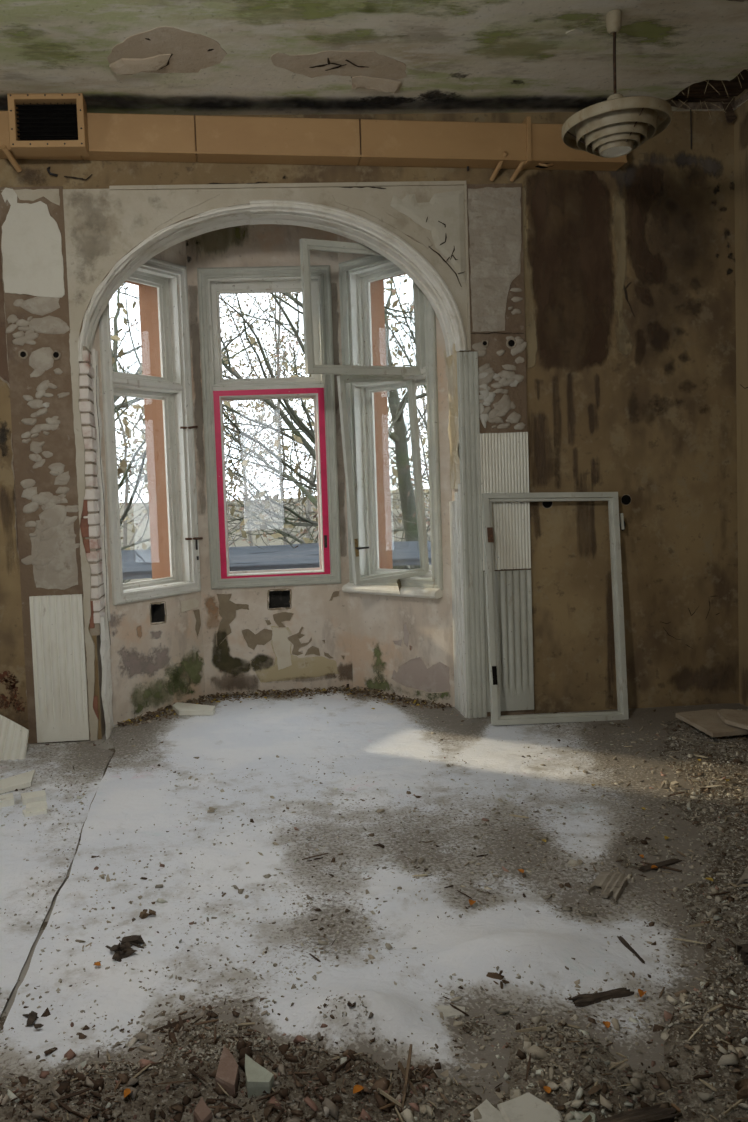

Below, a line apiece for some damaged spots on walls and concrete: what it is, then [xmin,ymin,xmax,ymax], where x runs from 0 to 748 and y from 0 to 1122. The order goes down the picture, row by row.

peeling [107,26,227,75]
peeling [271,50,407,93]
leakage [361,90,455,101]
leakage [522,153,734,555]
leakage [0,423,11,456]
flaking render [192,608,201,638]
flaking render [216,593,345,683]
flaking render [391,622,452,694]
leakage [607,578,615,705]